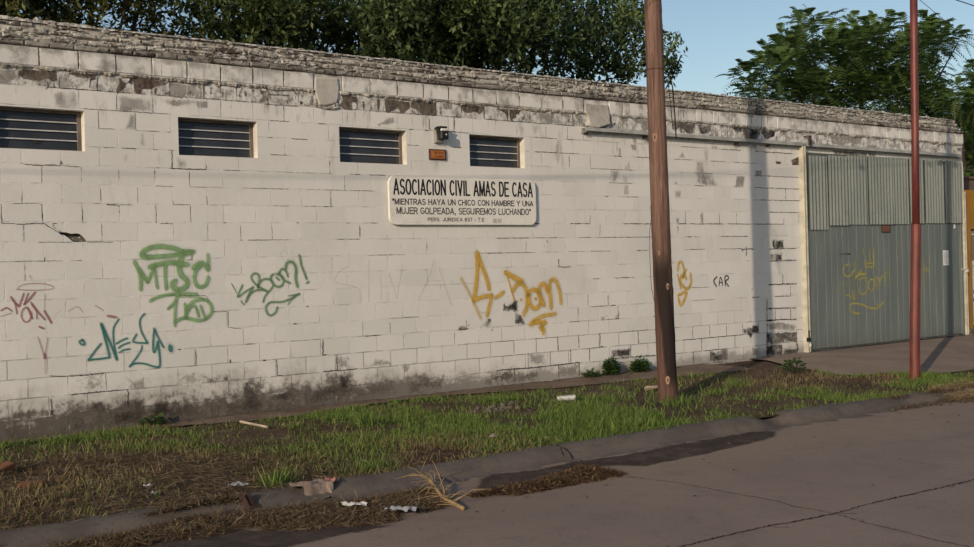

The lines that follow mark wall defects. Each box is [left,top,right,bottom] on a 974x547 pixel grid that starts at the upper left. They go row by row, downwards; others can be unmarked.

peeling [0,69,57,89]
peeling [69,72,96,87]
peeling [116,78,189,98]
peeling [300,93,364,111]
peeling [377,99,484,116]
peeling [498,108,521,119]
peeling [733,127,775,139]
crack [0,161,78,243]
leakage [74,359,391,428]